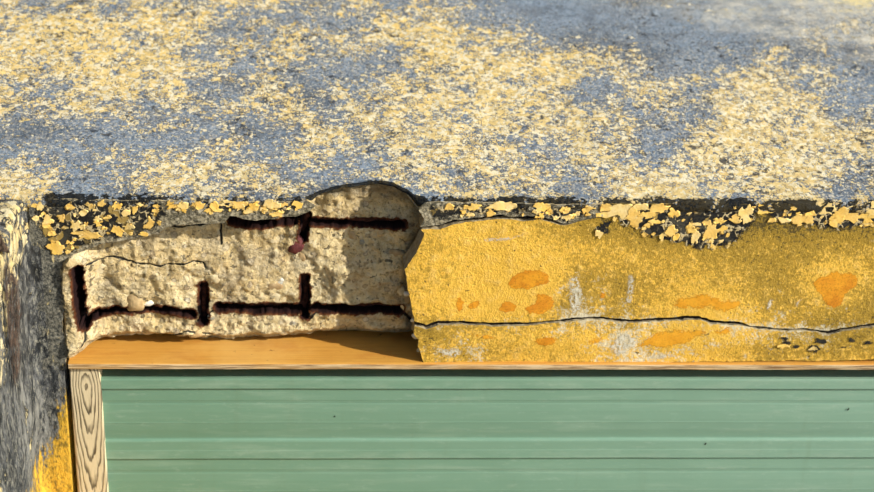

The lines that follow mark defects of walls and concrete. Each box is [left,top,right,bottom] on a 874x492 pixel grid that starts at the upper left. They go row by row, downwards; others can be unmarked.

crack [171,223,223,245]
rust [226,211,409,245]
crack [86,255,206,268]
spalling [61,184,421,360]
rust [68,265,406,333]
crack [404,312,874,334]